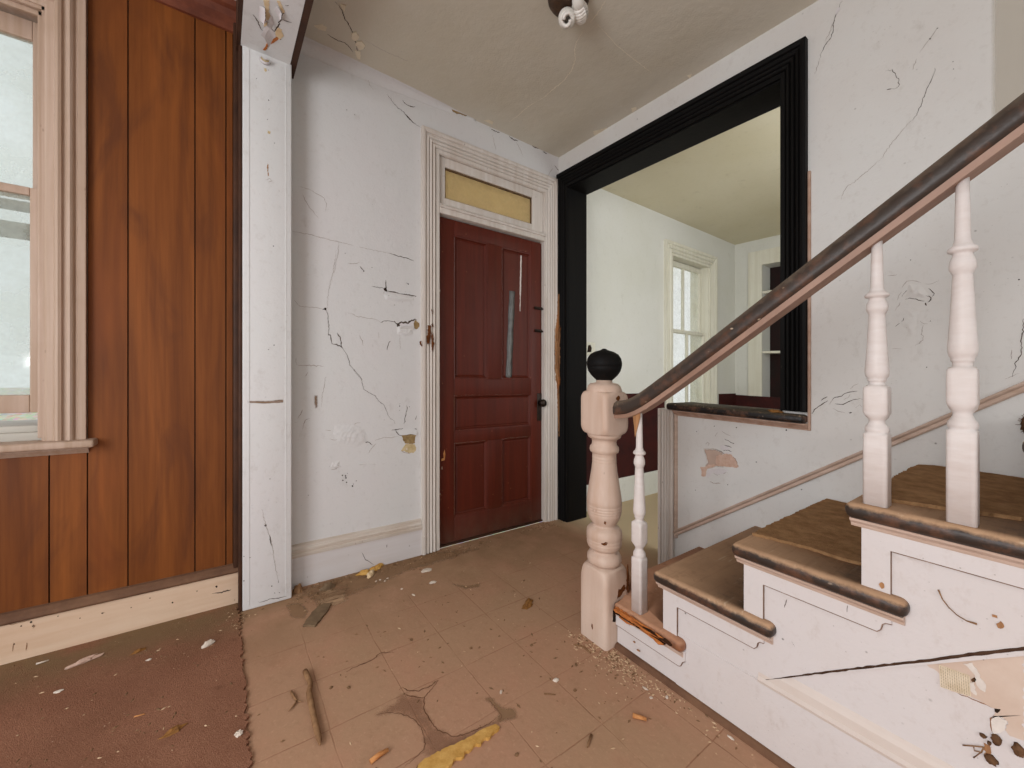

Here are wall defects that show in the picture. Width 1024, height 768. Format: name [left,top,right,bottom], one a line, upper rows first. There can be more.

peeling [253,0,291,79]
crack [841,28,954,199]
crack [293,188,416,429]
spalling [353,314,434,351]
spalling [378,416,417,454]
spalling [700,427,738,485]
crack [262,517,285,602]
peeling [613,564,672,646]
crack [380,680,502,768]
peeling [928,656,1024,740]